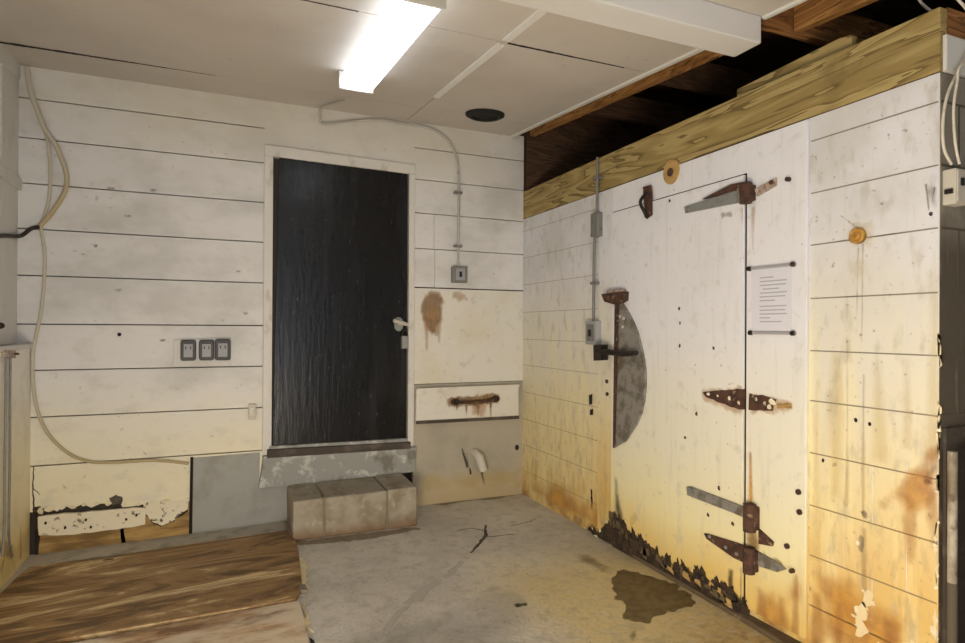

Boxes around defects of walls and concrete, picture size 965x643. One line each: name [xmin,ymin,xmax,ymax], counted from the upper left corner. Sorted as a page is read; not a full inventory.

corrosion [422,293,442,332]
peeling [37,495,189,527]
corrosion [901,472,931,505]
crack [384,519,534,635]
damp [611,569,696,623]
spalling [851,588,875,637]
peeling [930,608,939,643]
peeling [932,519,940,595]